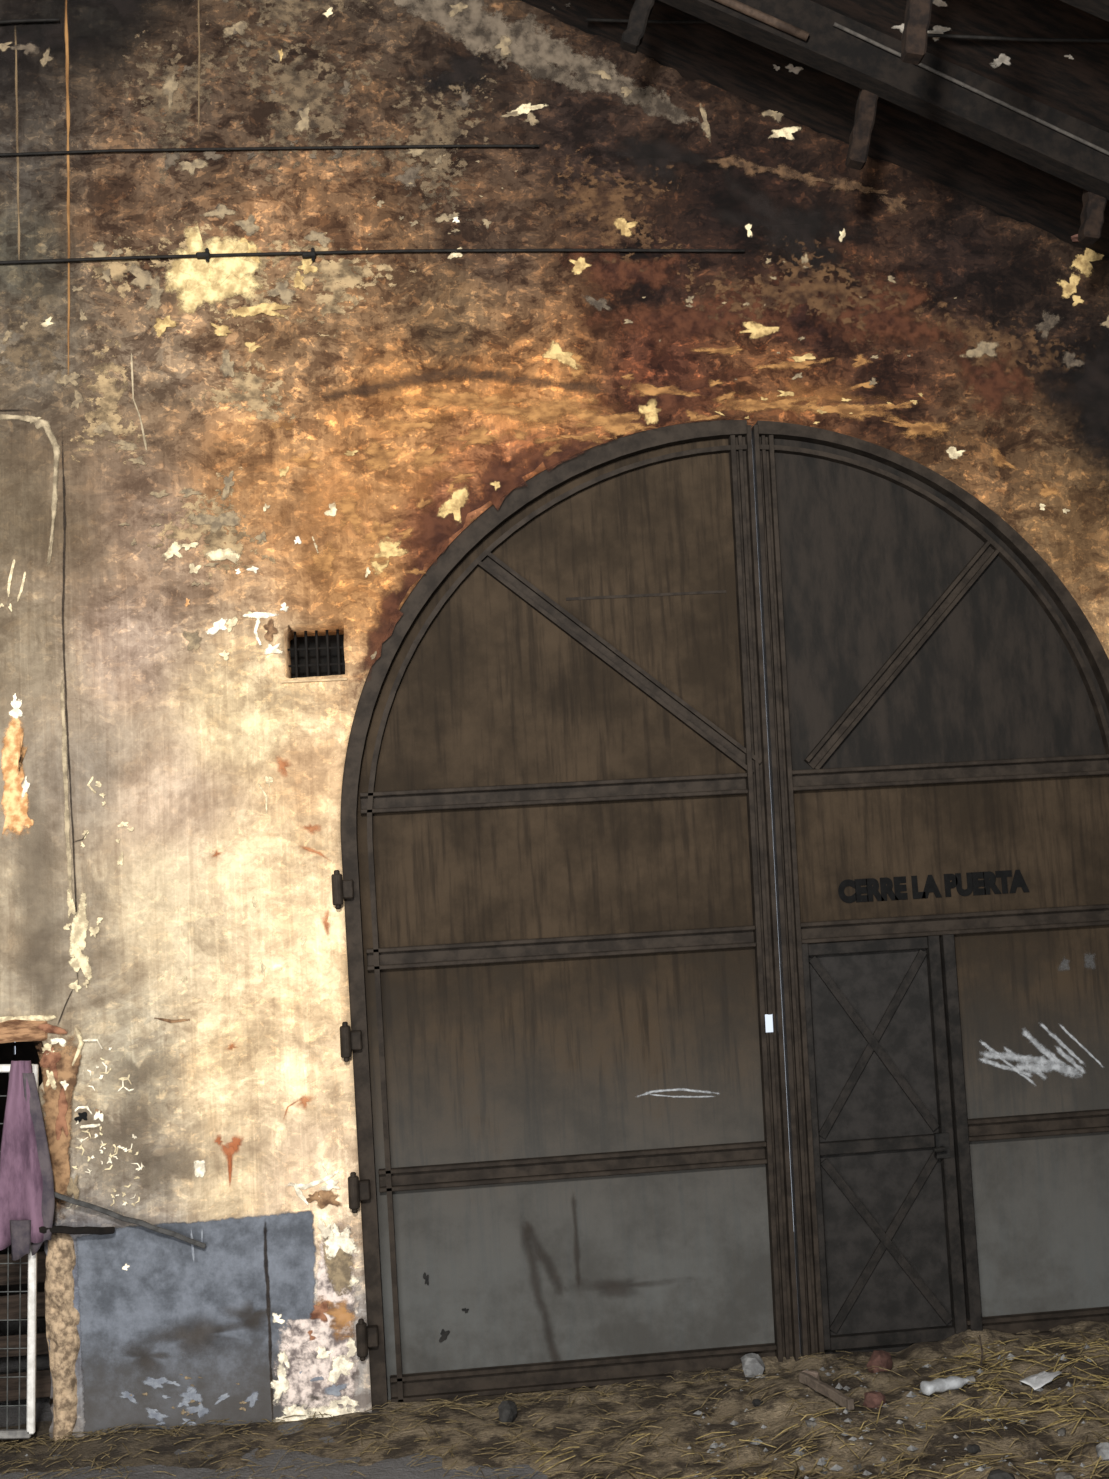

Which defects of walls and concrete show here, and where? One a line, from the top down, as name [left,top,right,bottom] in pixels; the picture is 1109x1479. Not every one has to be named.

peeling [122,0,711,259]
flaking render [762,110,801,140]
damp [713,170,868,282]
peeling [0,288,148,468]
peeling [72,204,416,477]
peeling [344,143,1109,469]
damp [1045,325,1109,464]
peeling [119,467,276,607]
peeling [418,474,473,522]
flaking render [182,603,289,655]
flaking render [1,693,33,835]
flaking render [120,1166,359,1426]